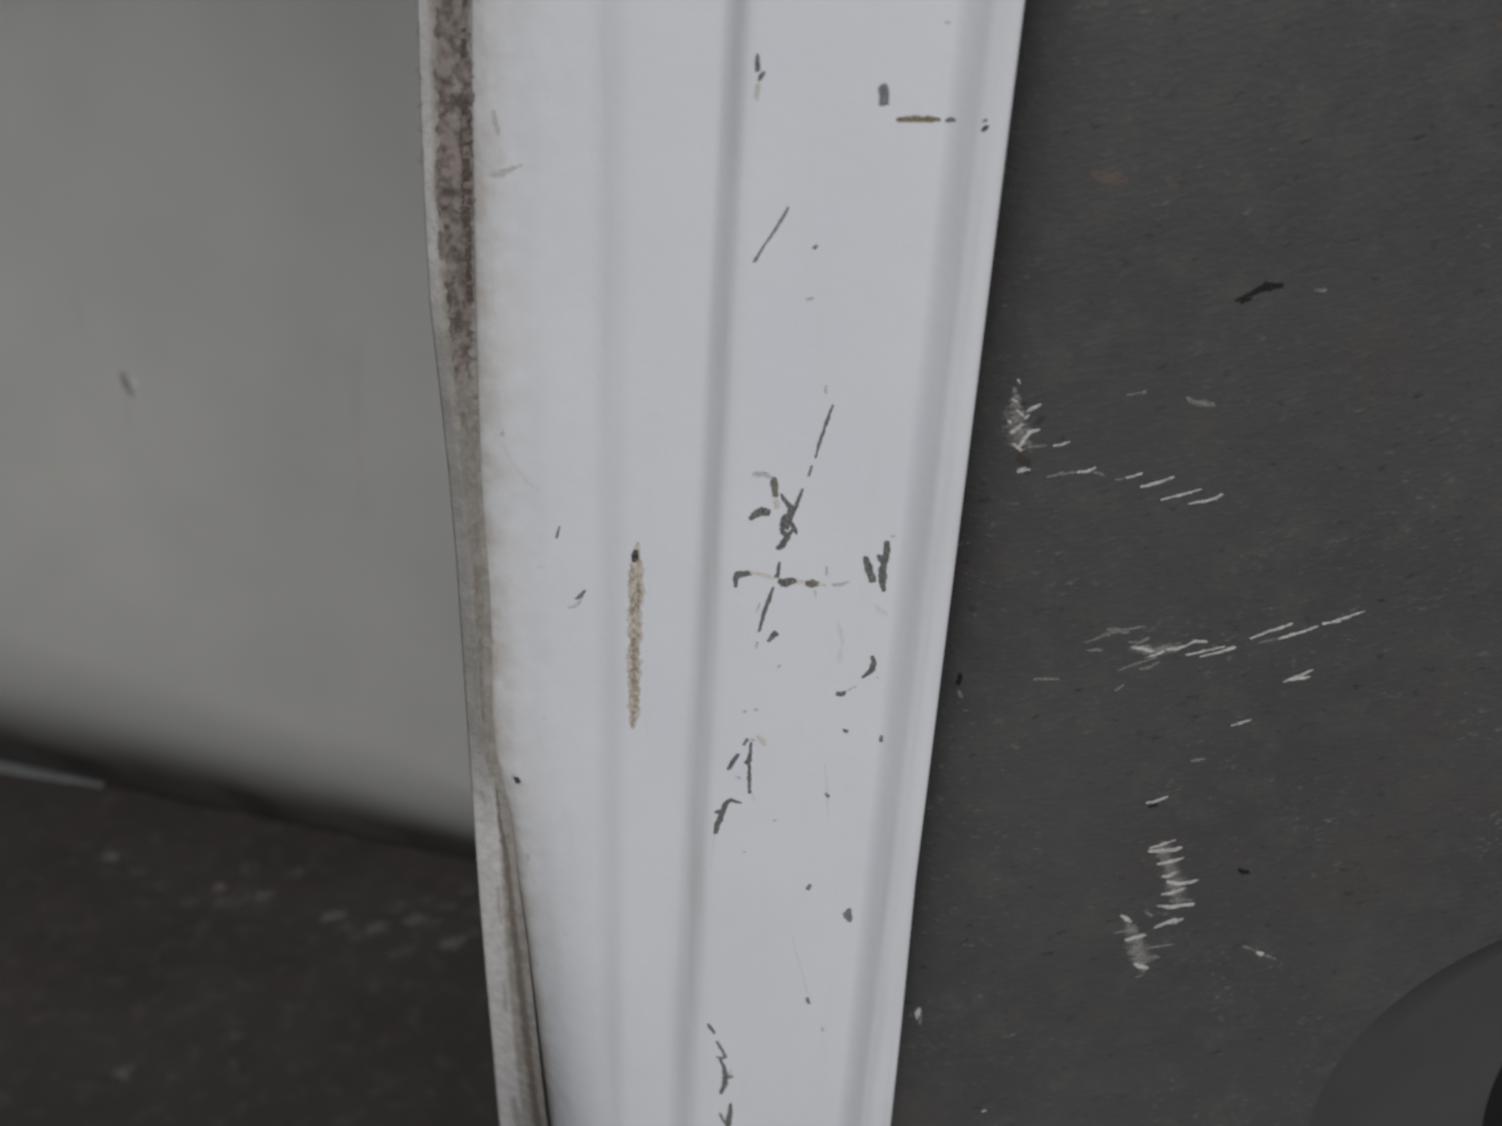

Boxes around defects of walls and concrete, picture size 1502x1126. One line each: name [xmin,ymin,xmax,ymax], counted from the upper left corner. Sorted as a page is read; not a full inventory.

peeling [732,471,849,597]
peeling [863,535,896,592]